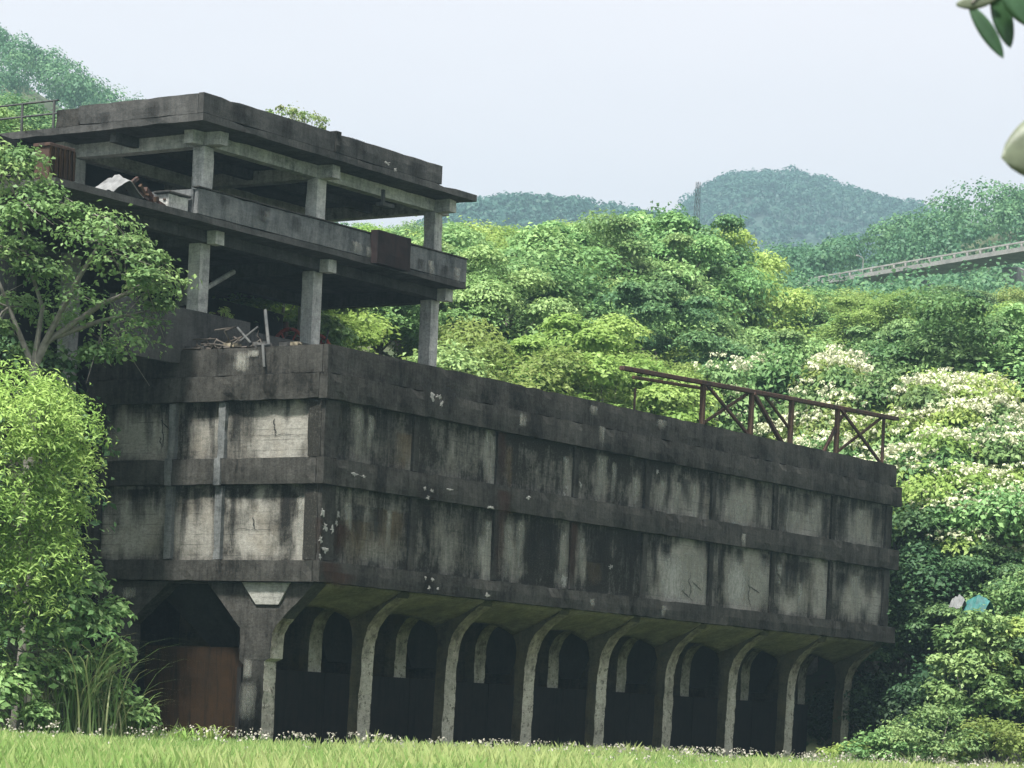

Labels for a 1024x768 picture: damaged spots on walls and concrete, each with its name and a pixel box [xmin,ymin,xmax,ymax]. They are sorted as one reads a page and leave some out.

spalling [318,508,340,560]